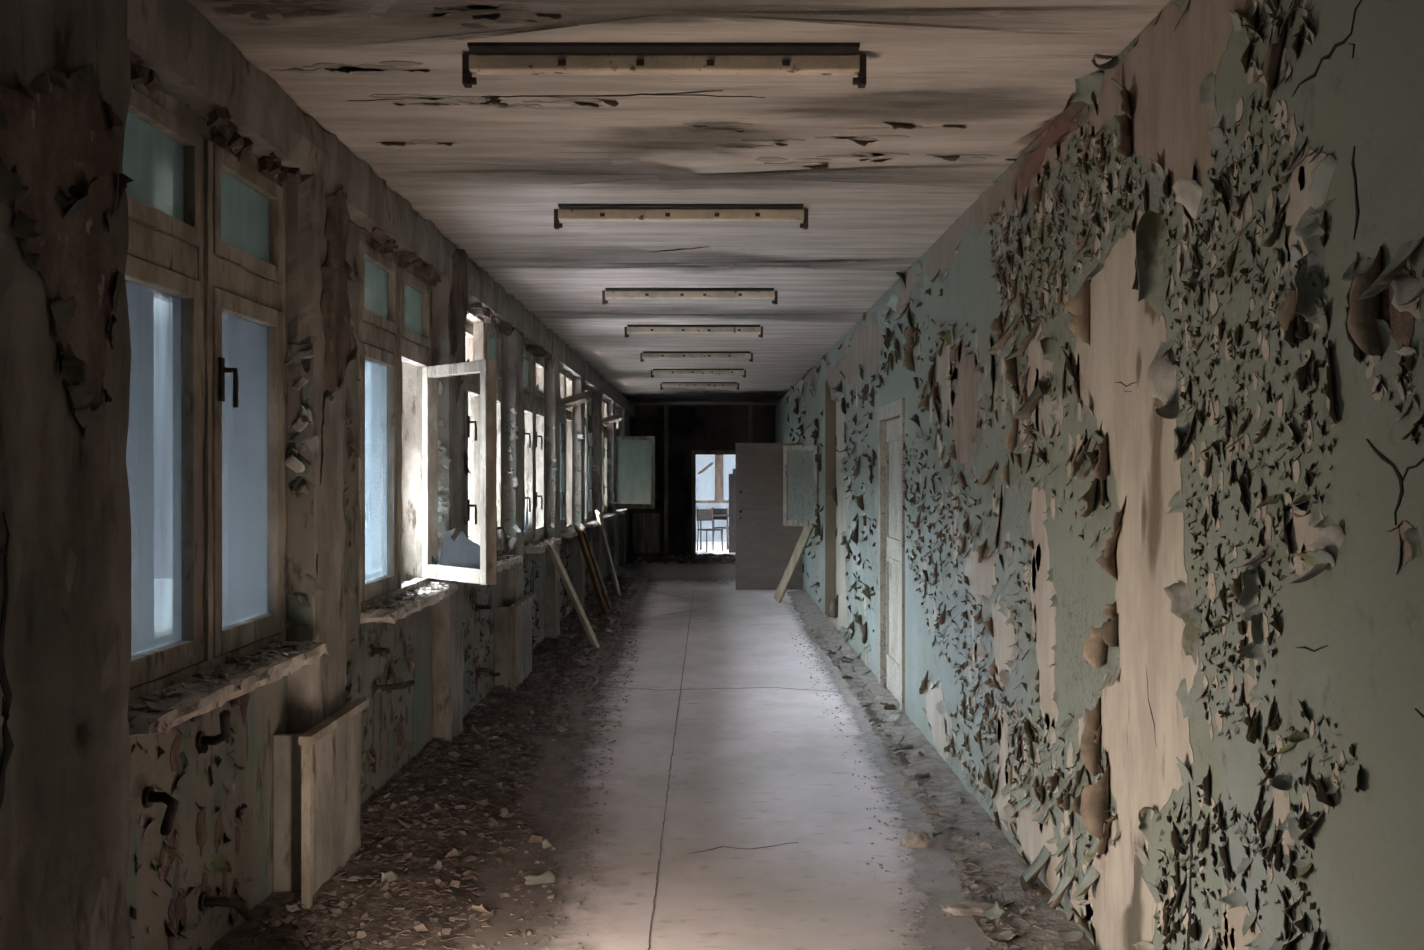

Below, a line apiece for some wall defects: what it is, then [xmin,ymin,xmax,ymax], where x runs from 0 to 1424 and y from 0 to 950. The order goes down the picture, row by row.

peeling [432,4,561,29]
crack [1292,0,1362,97]
spalling [0,63,134,438]
peeling [683,0,1424,950]
crack [1366,439,1424,526]
peeling [131,693,253,950]